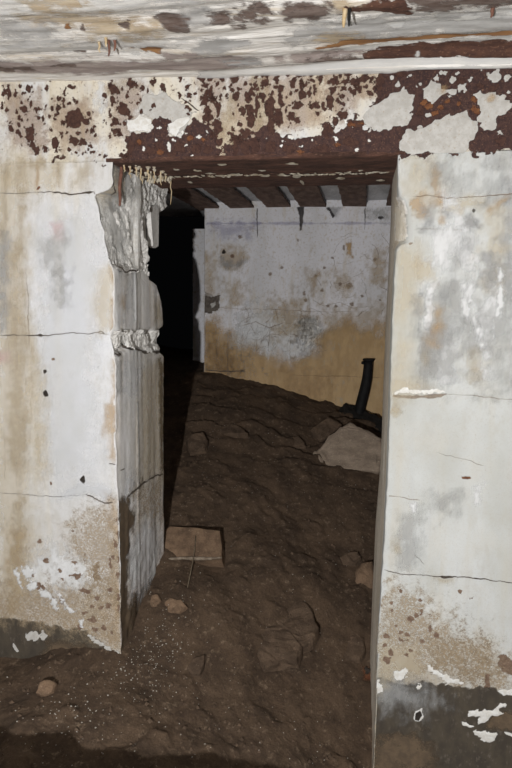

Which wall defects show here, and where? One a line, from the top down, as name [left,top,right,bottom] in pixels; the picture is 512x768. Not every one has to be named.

corrosion [333,0,512,15]
corrosion [306,31,512,63]
corrosion [0,68,512,167]
spalling [95,167,168,277]
crack [2,272,104,350]
spalling [111,329,160,353]
water stain [204,320,385,416]
crack [4,474,163,504]
crack [386,557,511,583]
water stain [0,617,119,659]
water stain [374,677,512,768]
peeling [462,689,512,743]